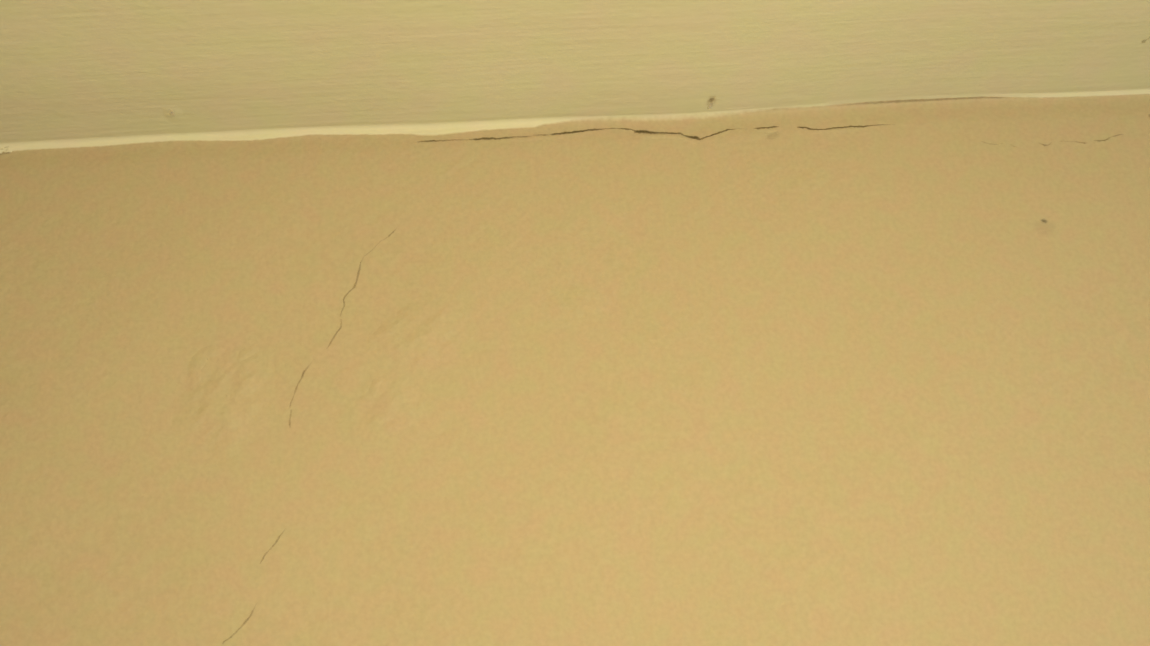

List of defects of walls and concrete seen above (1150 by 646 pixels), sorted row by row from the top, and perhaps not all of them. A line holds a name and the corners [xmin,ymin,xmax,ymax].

crack [475,125,873,144]